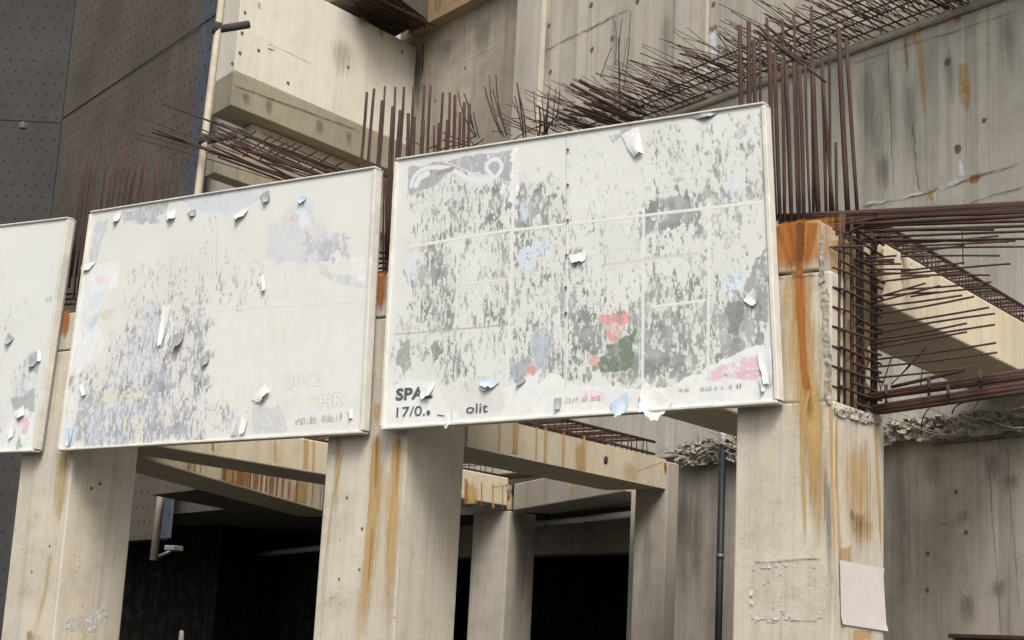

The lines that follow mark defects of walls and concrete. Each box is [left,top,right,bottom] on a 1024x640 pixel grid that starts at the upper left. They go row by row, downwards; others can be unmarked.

corrosion [904,21,924,96]
corrosion [960,64,969,106]
spalling [359,0,1024,425]
corrosion [776,218,881,562]
corrosion [222,440,315,506]
corrosion [562,433,586,472]
corrosion [362,439,401,619]